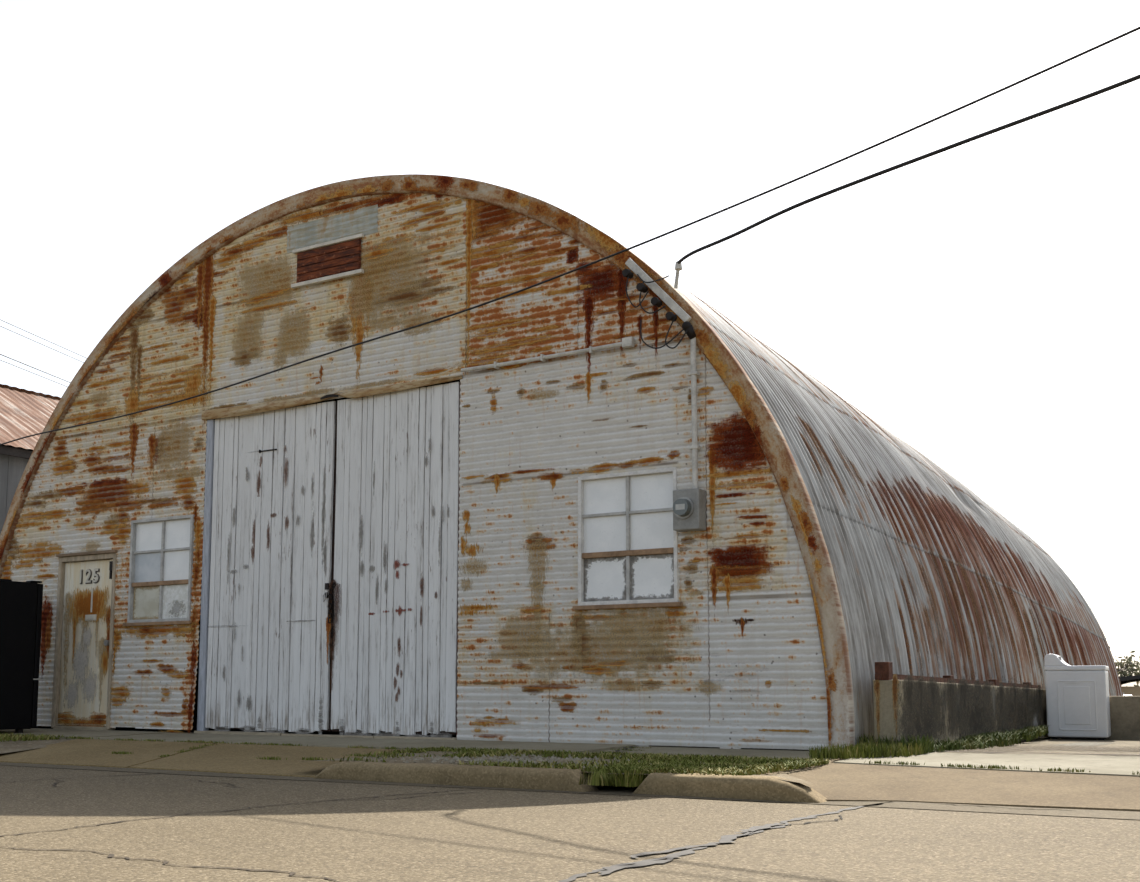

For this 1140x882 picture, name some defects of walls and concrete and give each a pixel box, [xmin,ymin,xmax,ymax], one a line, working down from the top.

peeling [246,456,262,497]
peeling [227,468,327,590]
peeling [360,516,437,625]
peeling [432,505,449,562]
rust [0,176,891,742]
rust [799,417,1088,687]
peeling [393,638,402,701]
water stain [489,609,689,681]